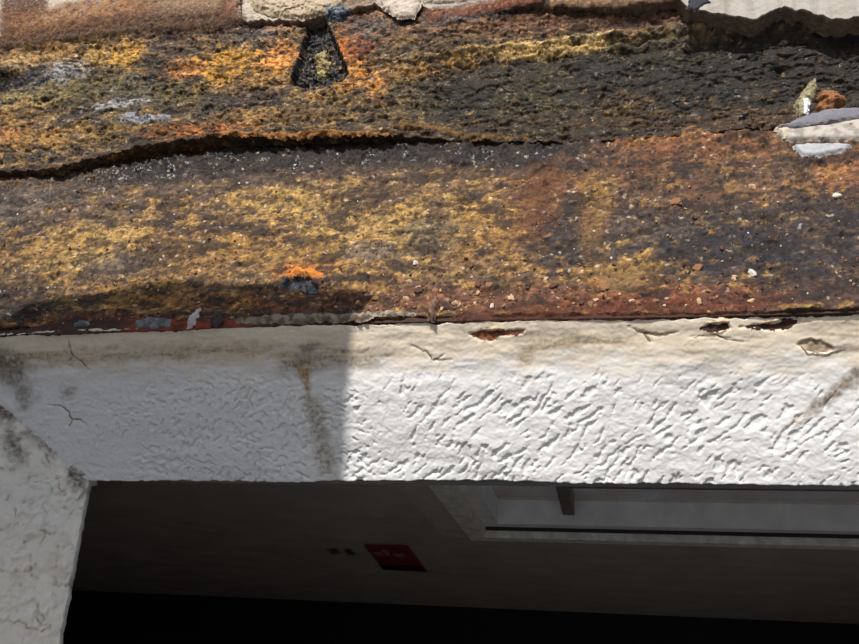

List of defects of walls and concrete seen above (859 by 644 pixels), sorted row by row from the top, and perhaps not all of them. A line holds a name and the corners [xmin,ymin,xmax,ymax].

corrosion [426,0,537,21]
hole [289,20,349,91]
corrosion [498,39,606,62]
corrosion [91,97,171,124]
corrosion [214,107,531,142]
peeling [471,326,525,341]
peeling [699,317,730,333]
peeling [746,316,797,332]
spalling [796,337,847,356]
water stain [811,368,859,407]